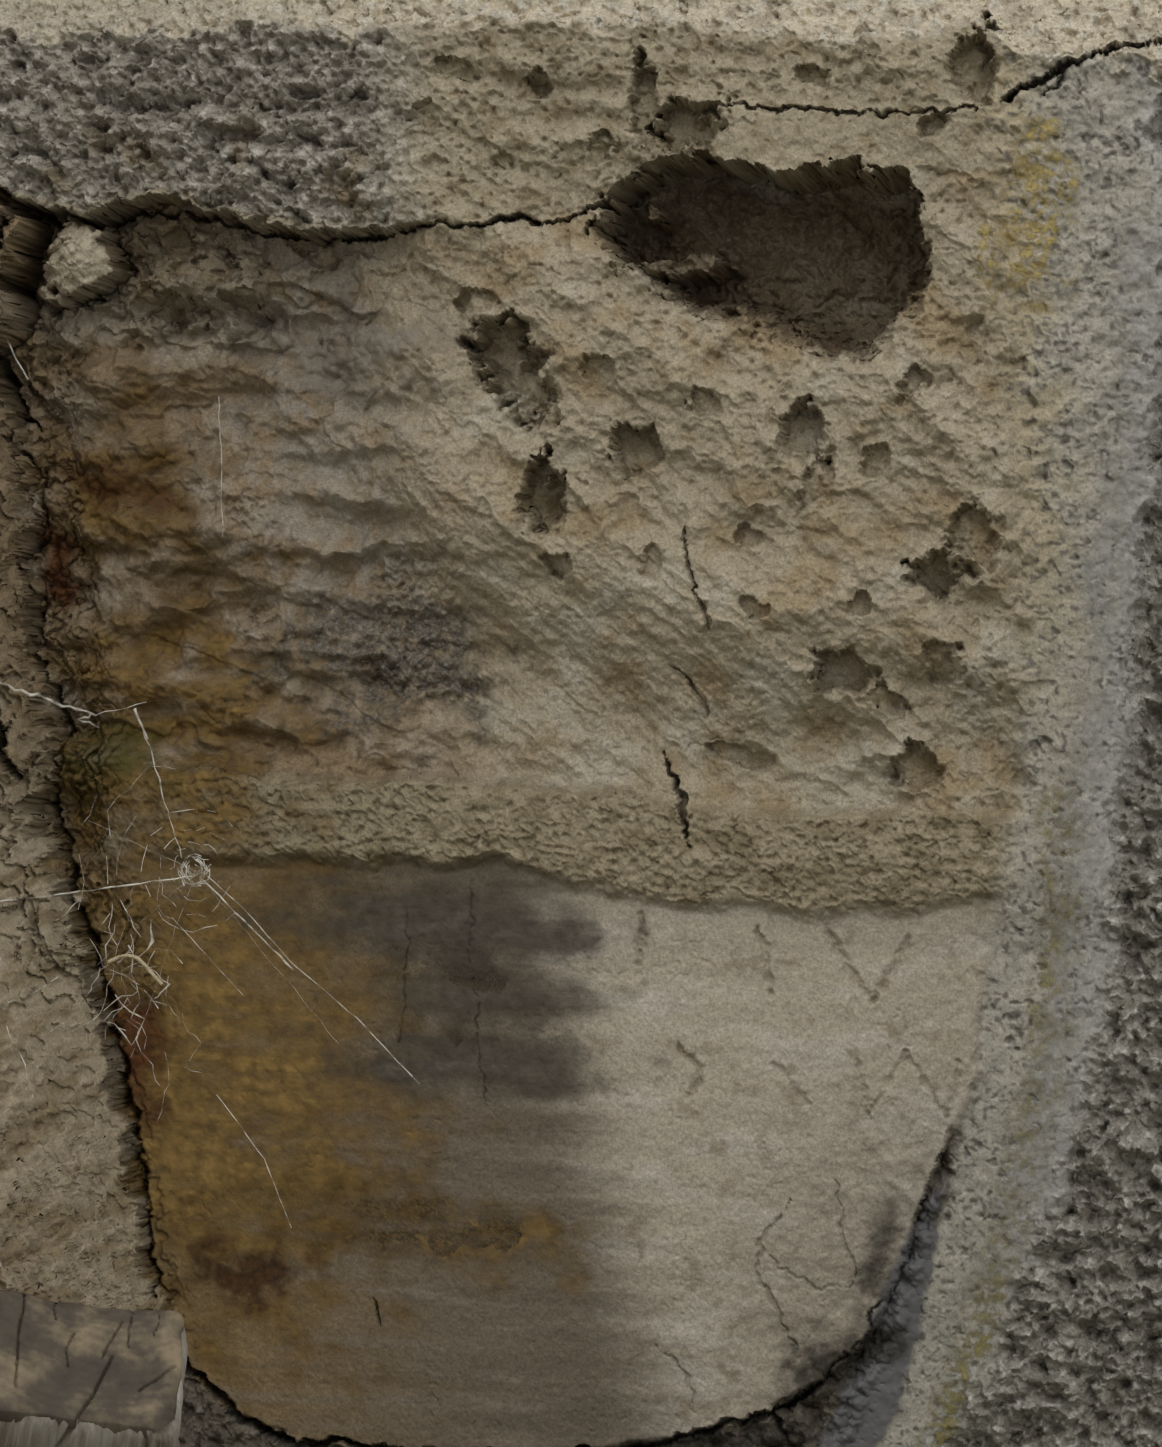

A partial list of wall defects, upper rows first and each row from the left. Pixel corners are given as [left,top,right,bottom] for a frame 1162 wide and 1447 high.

crack [719,36,1162,120]
crack [0,185,605,301]
spalling [0,143,1022,812]
leakage [47,383,490,869]
crack [681,526,712,632]
crack [671,663,711,718]
crack [0,352,164,1310]
crack [663,750,691,847]
leakage [84,861,601,1356]
crack [372,1297,381,1321]
crack [624,1180,881,1447]
crack [185,1356,434,1447]